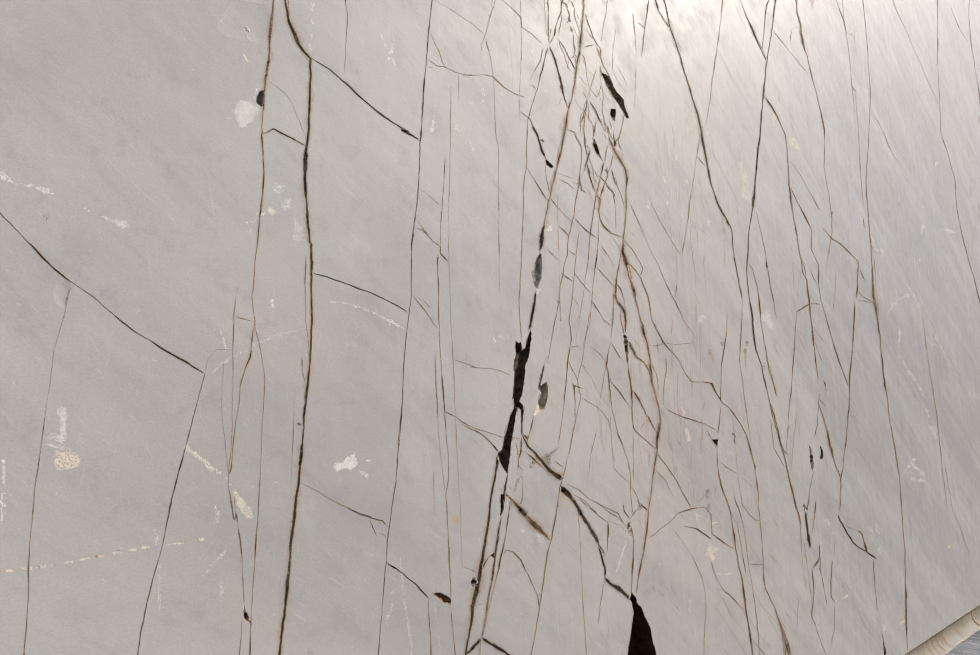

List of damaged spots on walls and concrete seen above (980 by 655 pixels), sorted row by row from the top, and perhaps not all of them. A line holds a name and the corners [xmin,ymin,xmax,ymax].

spalling [599,70,629,123]
crack [893,0,980,303]
crack [0,0,559,655]
spalling [497,330,549,474]
crack [457,0,902,655]
crack [922,311,970,554]
peeling [619,591,657,655]
crack [894,518,909,651]